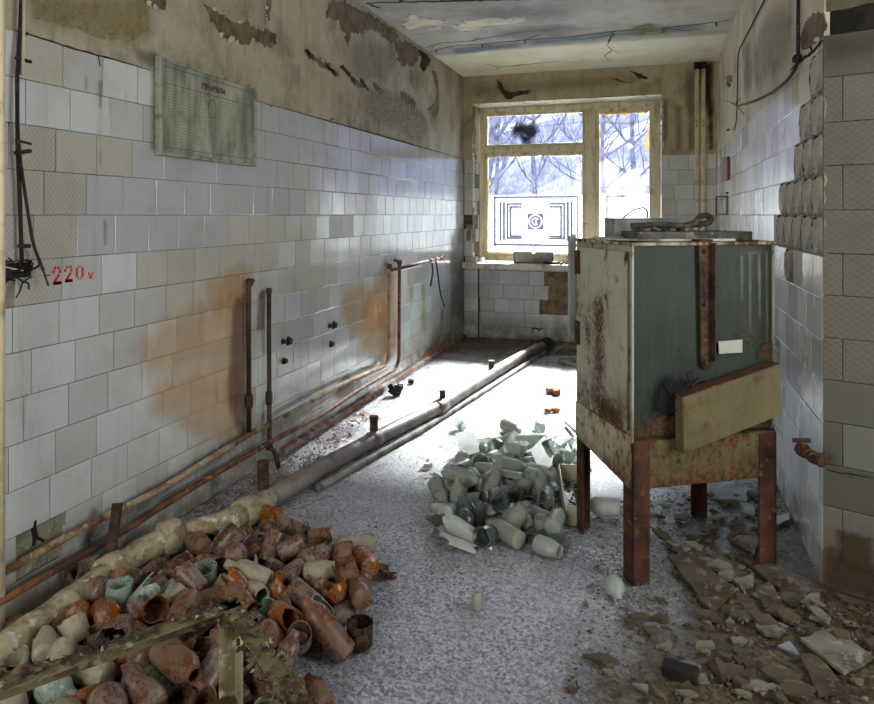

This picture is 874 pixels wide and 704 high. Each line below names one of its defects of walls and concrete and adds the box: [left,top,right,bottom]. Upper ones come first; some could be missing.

peeling [204,0,278,49]
flaking render [304,47,384,94]
peeling [324,0,526,118]
crack [427,20,729,83]
peeling [472,79,532,162]
leakage [700,63,713,149]
peeling [776,12,829,283]
peeling [531,271,577,315]
peeling [16,511,66,580]